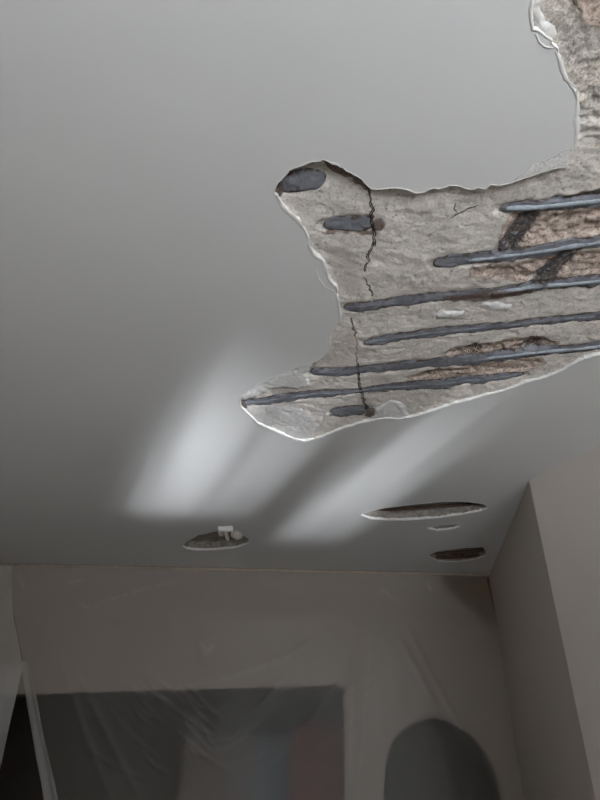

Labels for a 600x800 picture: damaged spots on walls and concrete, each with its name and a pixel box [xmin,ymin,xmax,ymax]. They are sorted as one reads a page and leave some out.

crack [364,190,376,296]
spalling [239,0,600,443]
crack [351,318,369,410]
spalling [181,526,249,551]
spalling [360,501,489,531]
spalling [428,547,486,562]